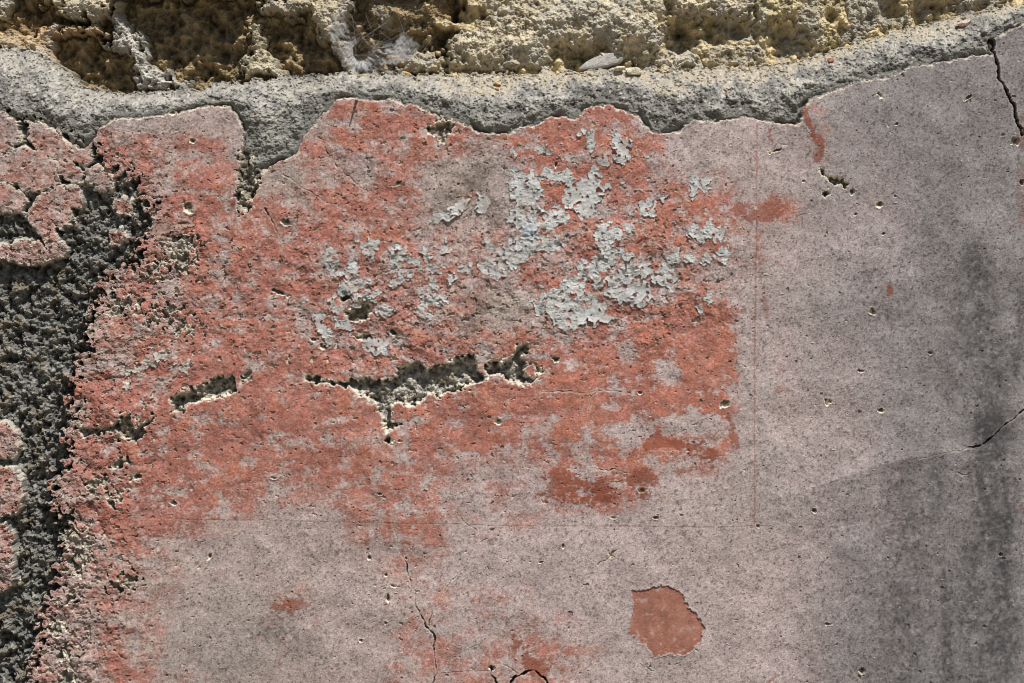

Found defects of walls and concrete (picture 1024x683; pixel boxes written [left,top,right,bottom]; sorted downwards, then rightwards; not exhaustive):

spalling [426,116,456,144]
crack [987,38,1024,136]
spalling [232,147,262,217]
spalling [305,128,734,444]
spalling [0,107,253,683]
crack [918,408,1024,477]
crack [391,515,438,683]